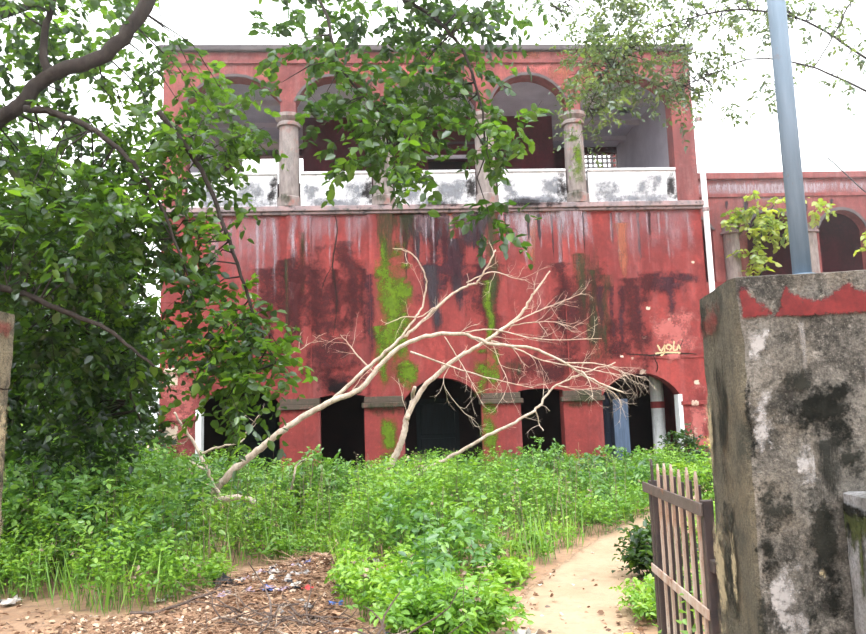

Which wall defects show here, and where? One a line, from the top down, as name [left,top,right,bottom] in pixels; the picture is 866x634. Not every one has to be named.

leakage [304,181,372,228]
leakage [257,241,376,393]
leakage [401,174,697,383]
peeling [739,283,866,318]
leakage [714,367,728,448]
leakage [744,380,755,457]
leakage [723,501,738,617]
leakage [757,592,768,634]
leakage [754,468,796,582]
leakage [782,369,865,634]